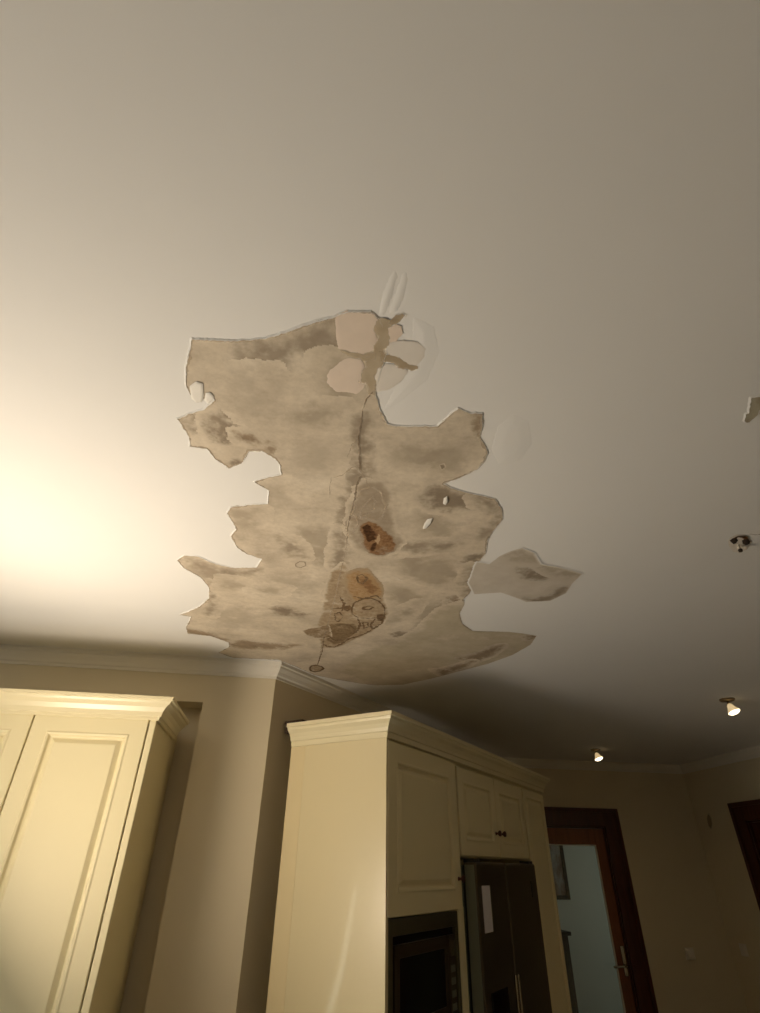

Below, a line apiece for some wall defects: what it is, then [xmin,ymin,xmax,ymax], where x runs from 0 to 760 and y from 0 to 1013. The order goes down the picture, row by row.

peeling [176,310,504,685]
rust [302,477,408,672]
crack [320,314,418,653]
leakage [179,319,583,685]
peeling [743,395,760,423]